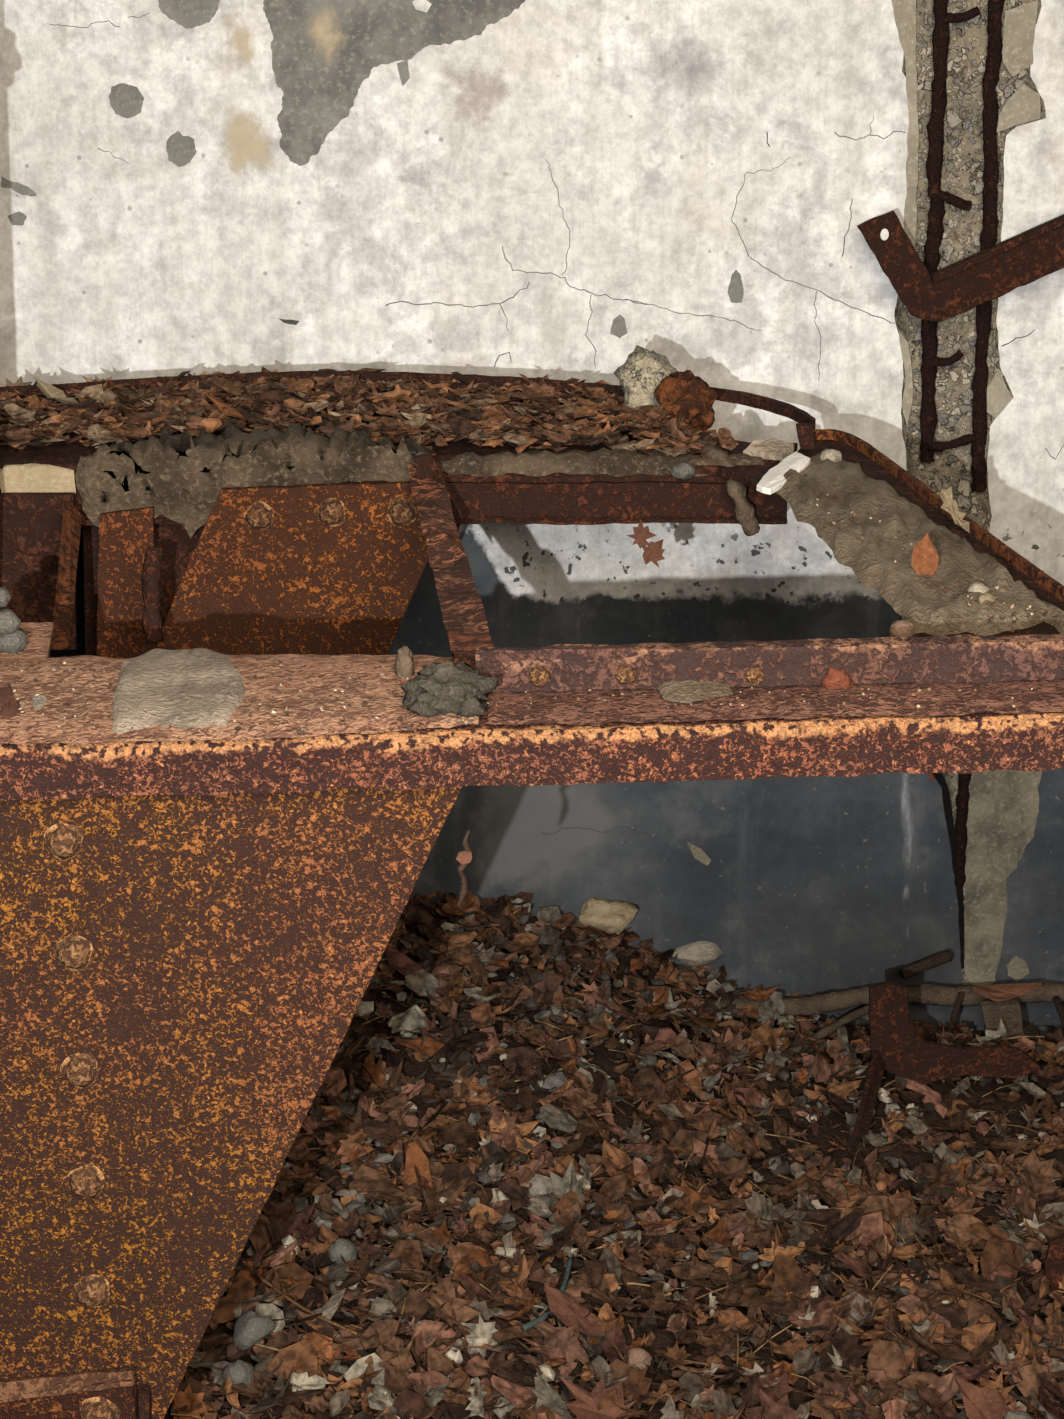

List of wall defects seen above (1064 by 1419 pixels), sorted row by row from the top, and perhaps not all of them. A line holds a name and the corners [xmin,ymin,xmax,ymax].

crack [834,115,906,141]
spalling [892,0,1046,276]
crack [385,159,761,367]
crack [731,132,892,381]
spalling [894,296,1014,532]
corrosion [0,684,47,719]
corrosion [657,680,733,703]
peeling [942,770,1042,986]